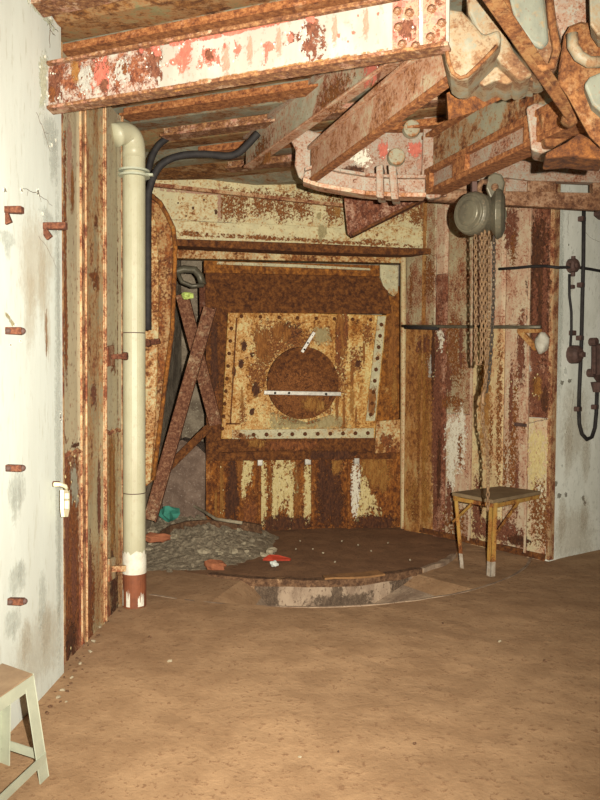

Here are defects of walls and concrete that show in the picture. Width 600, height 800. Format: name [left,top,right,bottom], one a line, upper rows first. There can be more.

peeling [39,51,63,114]
peeling [73,55,130,96]
peeling [142,39,242,86]
peeling [261,16,327,66]
corrosion [63,114,75,386]
corrosion [160,185,435,302]
corrosion [478,207,552,488]
corrosion [88,433,118,639]
corrosion [225,461,243,520]
corrosion [232,313,399,531]
corrosion [407,309,552,555]
corrosion [66,619,77,661]